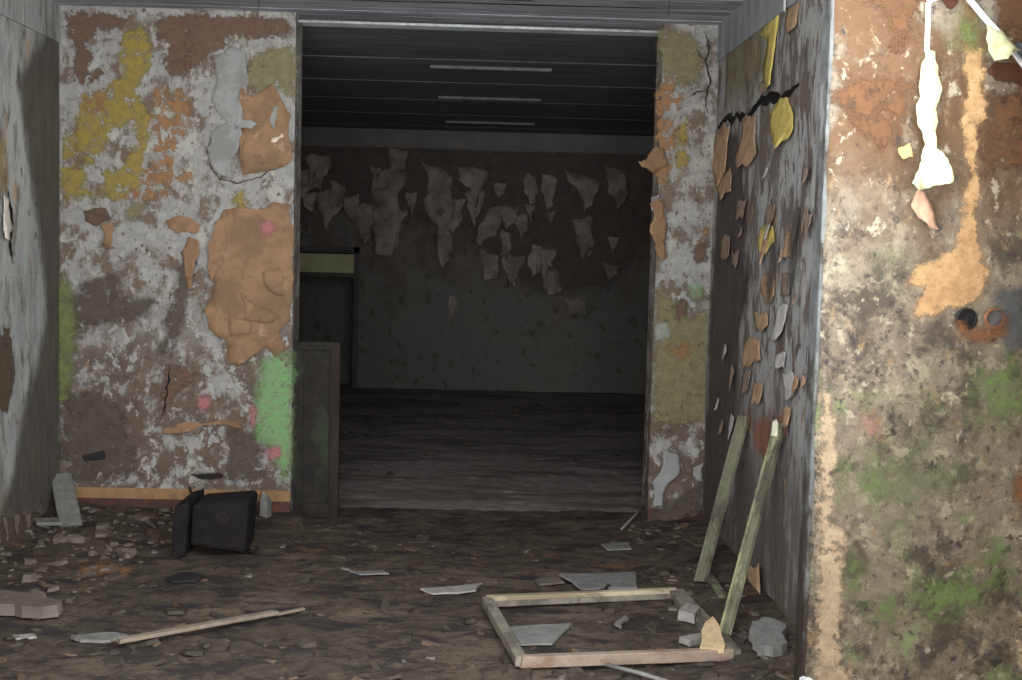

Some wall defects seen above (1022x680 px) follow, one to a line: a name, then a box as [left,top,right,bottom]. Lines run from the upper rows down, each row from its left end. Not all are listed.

peeling [64,11,127,114]
peeling [156,12,291,76]
peeling [238,83,292,175]
peeling [639,116,690,182]
peeling [712,122,732,200]
crack [690,32,799,134]
peeling [863,0,1022,176]
peeling [649,195,668,260]
peeling [0,325,15,414]
peeling [159,202,294,481]
peeling [722,204,812,405]
peeling [814,390,852,680]